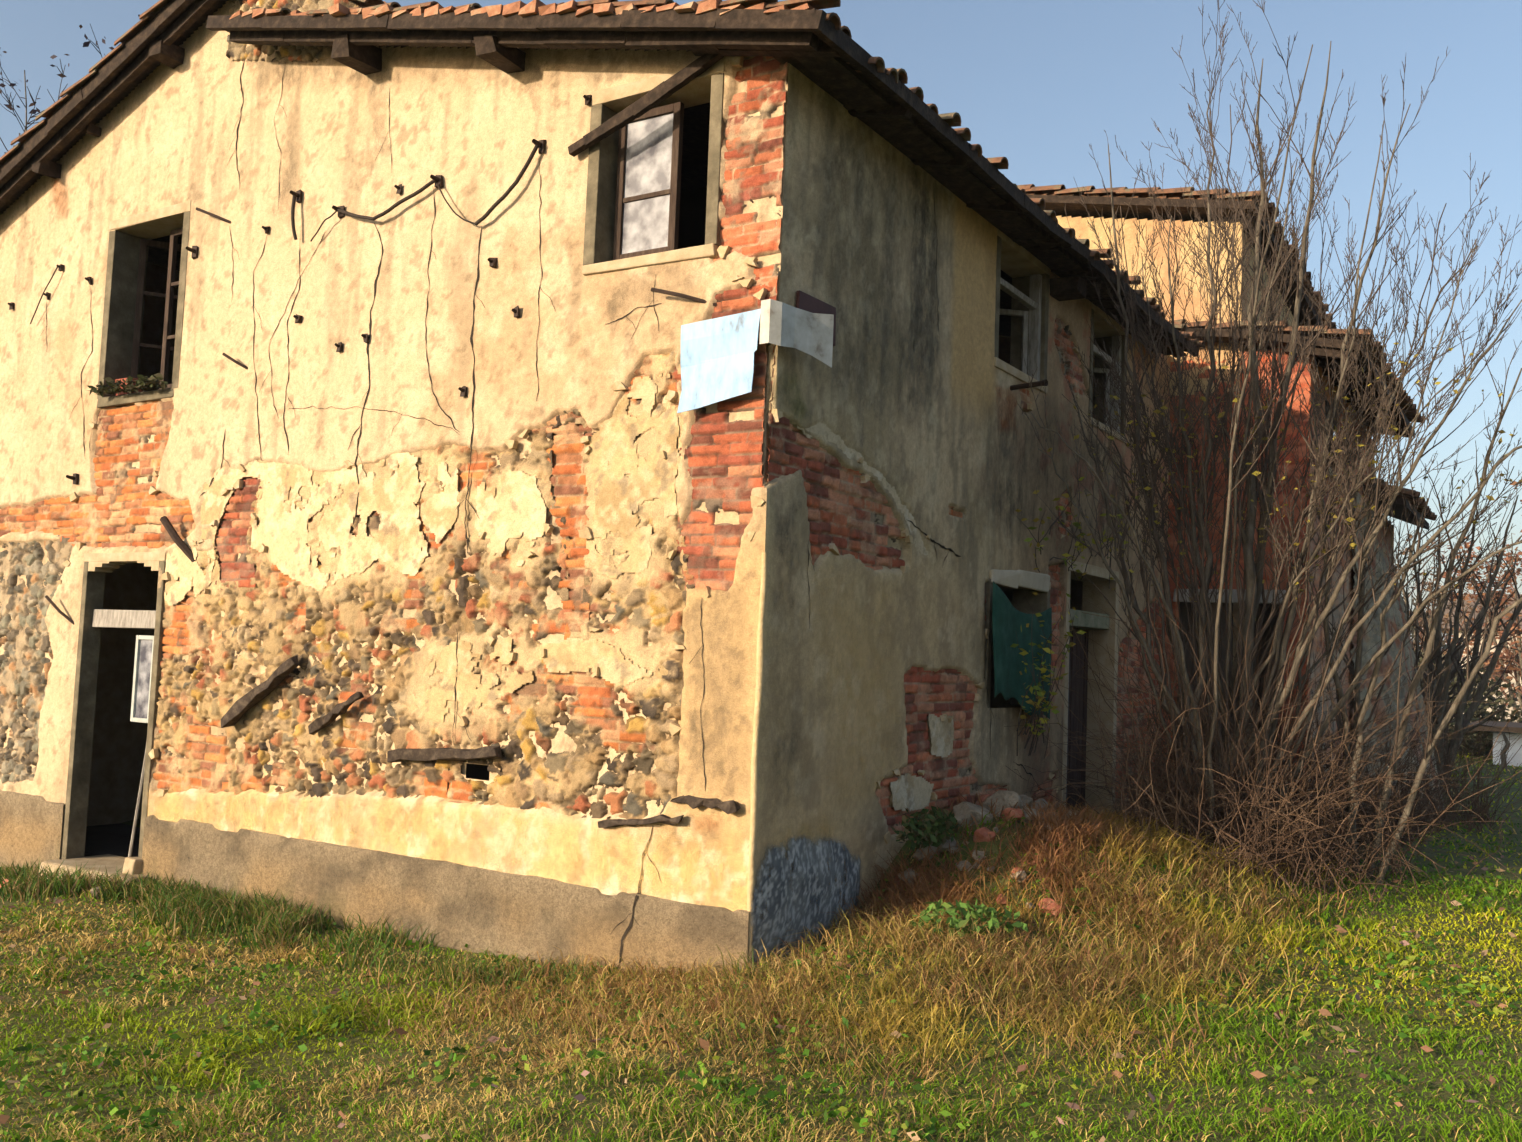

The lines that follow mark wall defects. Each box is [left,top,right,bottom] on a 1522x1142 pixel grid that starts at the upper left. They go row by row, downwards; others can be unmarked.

crack [199,60,484,551]
crack [536,161,555,401]
flaking render [0,56,931,819]
flaking render [875,666,1007,844]
crack [612,827,661,963]